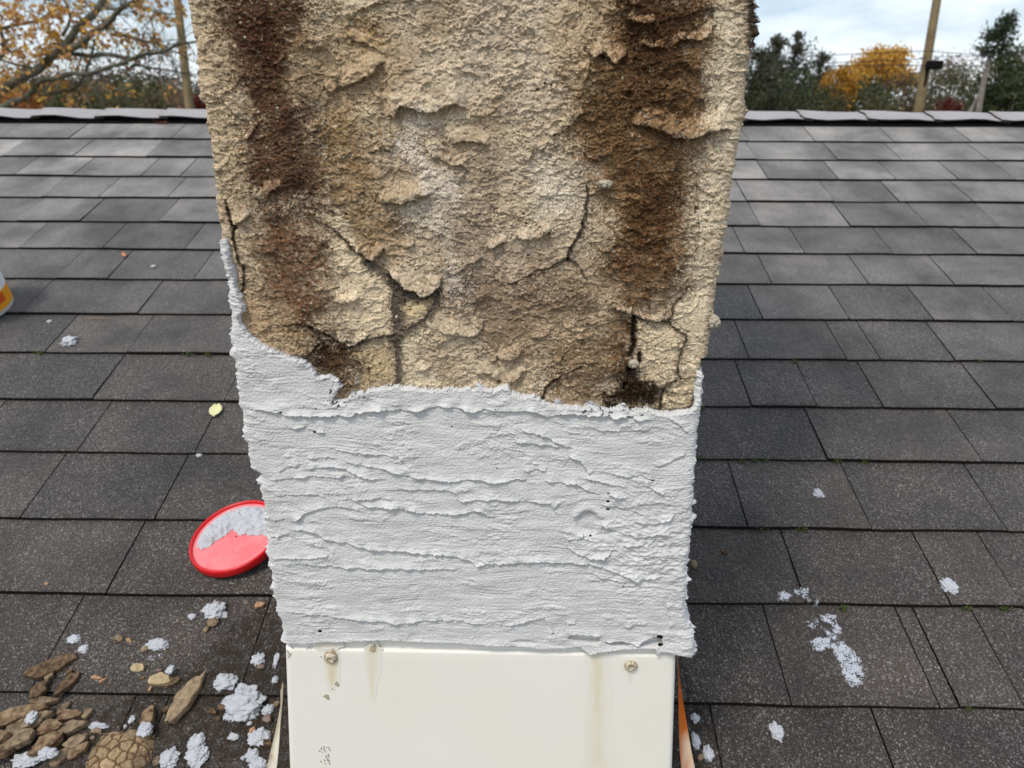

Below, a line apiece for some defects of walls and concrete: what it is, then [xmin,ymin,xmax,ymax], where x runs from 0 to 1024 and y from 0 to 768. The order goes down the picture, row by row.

flaking render [325,26,394,92]
flaking render [589,9,716,64]
flaking render [377,72,474,119]
flaking render [631,101,734,140]
crack [224,201,245,292]
flaking render [378,174,433,205]
leakage [203,0,760,408]
crack [509,186,603,285]
crack [283,221,442,384]
crack [590,281,694,410]
corrosion [312,642,344,691]
corrosion [363,641,383,702]